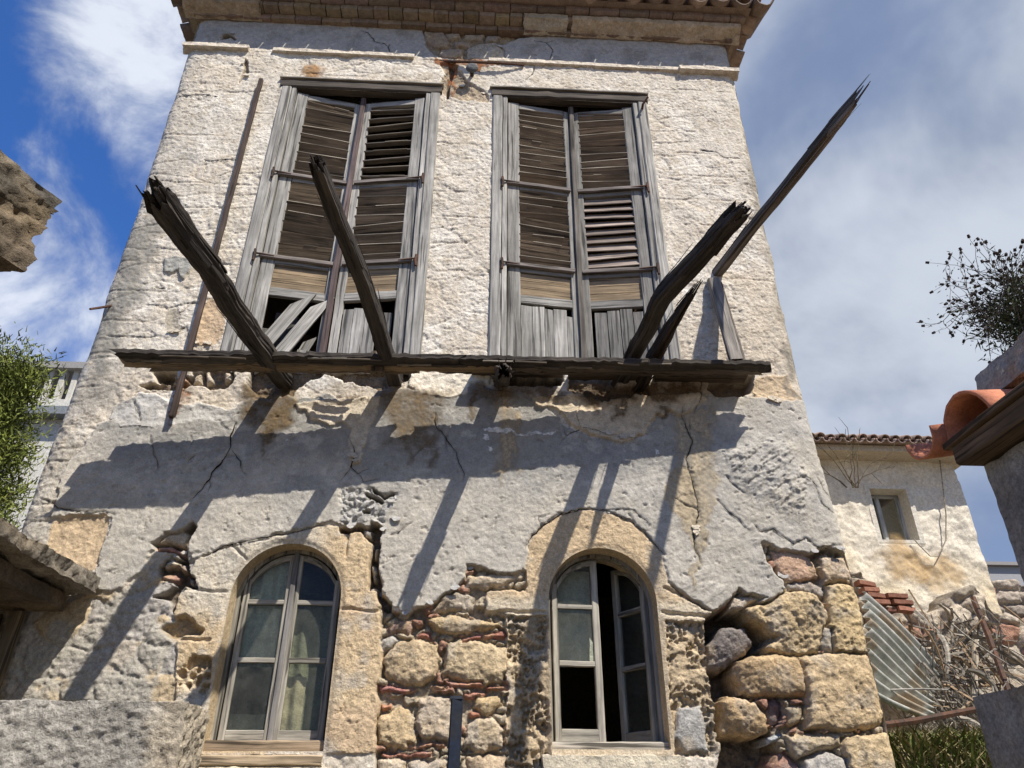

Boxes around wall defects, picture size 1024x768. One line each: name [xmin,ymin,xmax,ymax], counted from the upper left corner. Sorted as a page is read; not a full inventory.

rust [434,57,500,95]
spalling [141,371,235,391]
crack [188,424,242,500]
crack [676,382,836,560]
flaking render [47,513,110,572]
spalling [156,521,204,639]
crack [209,525,324,555]
spalling [340,486,527,768]
spalling [674,545,895,768]